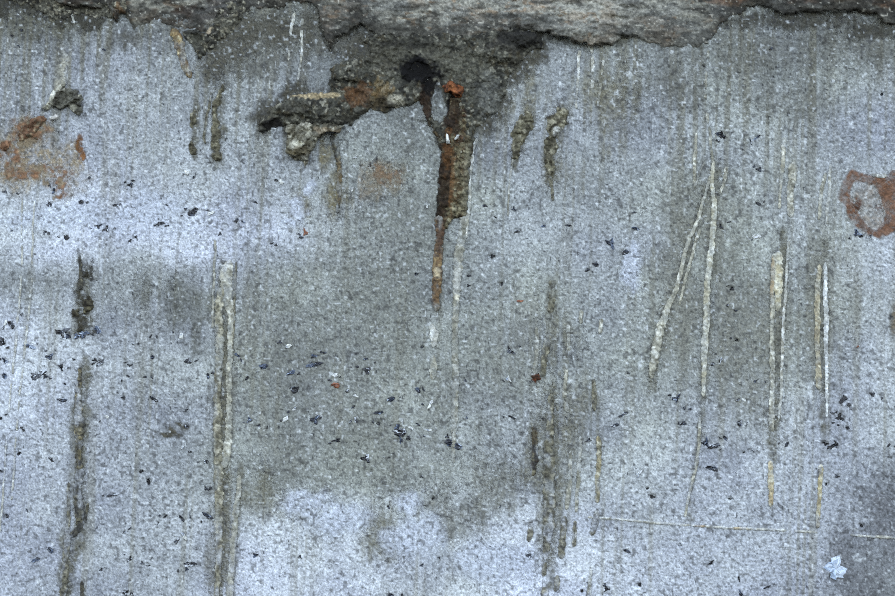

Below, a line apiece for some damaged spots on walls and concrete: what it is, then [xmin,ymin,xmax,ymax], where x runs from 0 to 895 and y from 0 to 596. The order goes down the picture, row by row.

peeling [183,29,224,59]
rust [0,81,85,199]
rust [841,170,895,238]
damp [69,248,95,338]
rust [427,97,478,463]
damp [649,162,787,459]
damp [58,358,91,596]
damp [208,260,243,596]
damp [285,466,515,558]
damp [524,379,597,596]
spalling [701,436,728,450]
spalling [830,395,851,430]